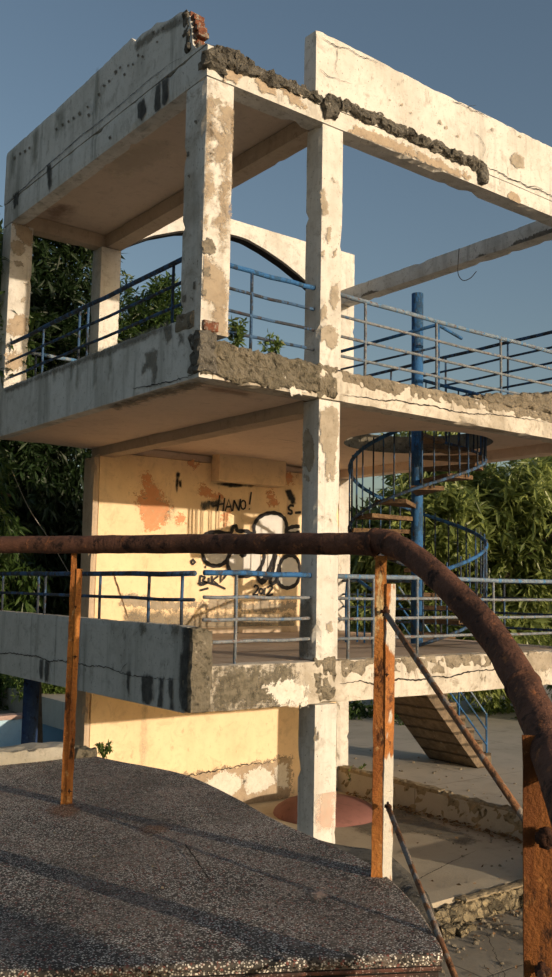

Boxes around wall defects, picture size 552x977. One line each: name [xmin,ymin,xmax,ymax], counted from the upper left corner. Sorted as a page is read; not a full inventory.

water stain [137,76,169,121]
spalling [181,9,489,185]
spalling [175,177,552,485]
crack [347,395,552,423]
peeling [134,470,187,532]
water stain [39,660,49,681]
crack [0,652,179,680]
water stain [141,675,173,710]
peeling [215,656,374,708]
spalling [394,653,491,674]
peeling [525,650,552,672]
peeling [181,754,294,804]